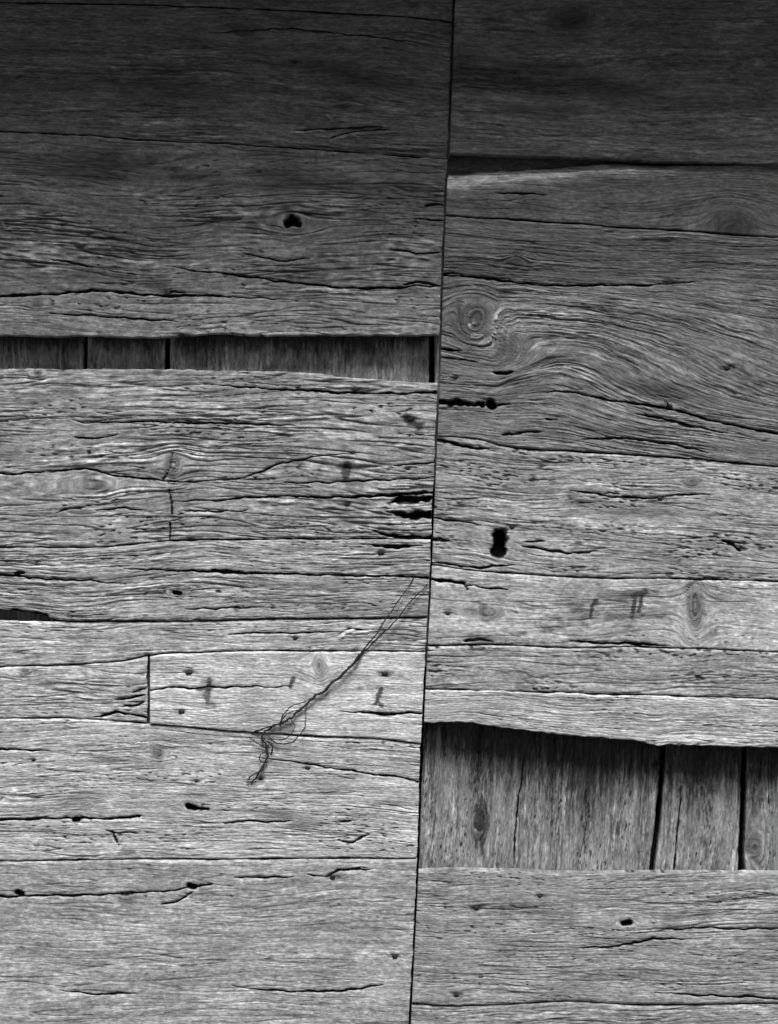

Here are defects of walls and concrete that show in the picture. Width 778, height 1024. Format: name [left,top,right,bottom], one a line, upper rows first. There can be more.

crack [417,203,444,221]
crack [0,249,691,322]
crack [0,418,596,590]
crack [0,815,141,846]
crack [0,820,370,905]
crack [224,818,292,826]